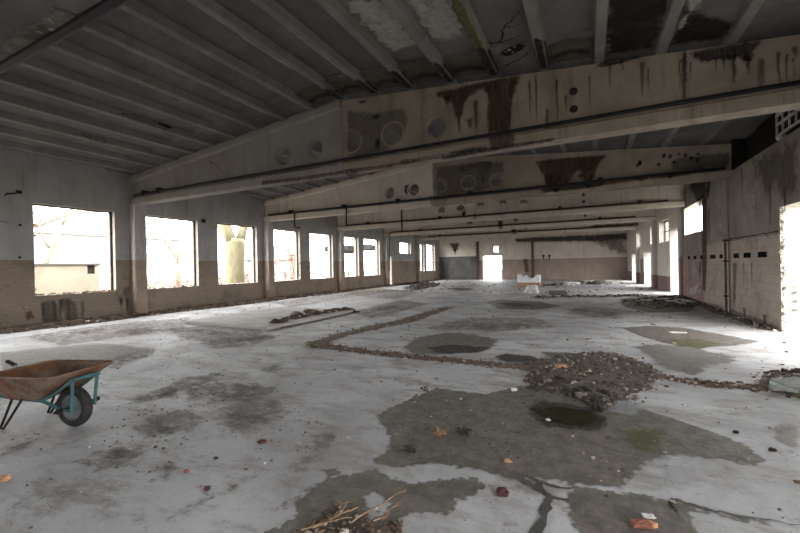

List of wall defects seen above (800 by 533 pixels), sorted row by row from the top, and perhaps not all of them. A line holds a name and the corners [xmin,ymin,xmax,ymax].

crack [487,7,531,66]
damp [598,0,666,79]
damp [671,0,764,99]
damp [296,47,555,195]